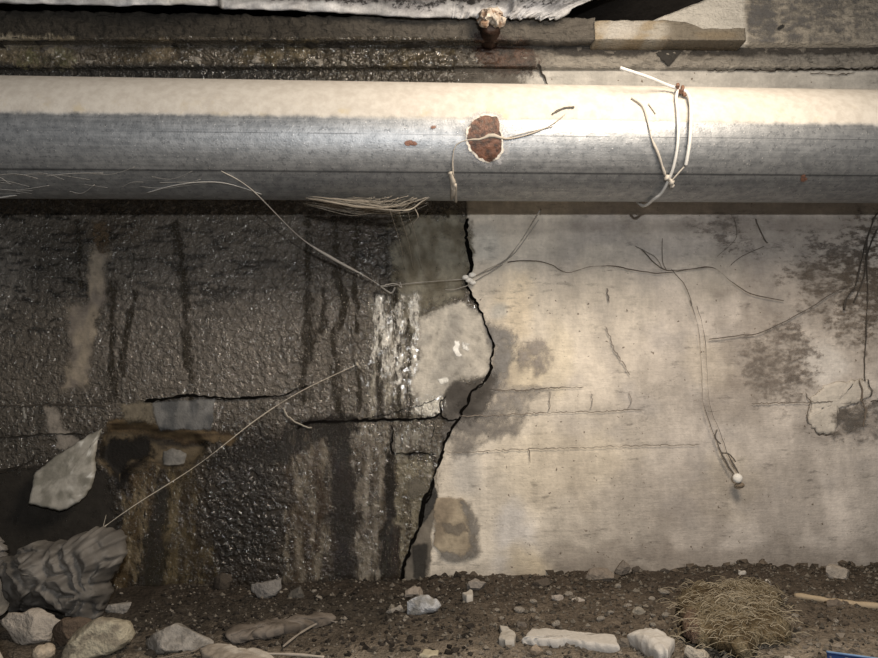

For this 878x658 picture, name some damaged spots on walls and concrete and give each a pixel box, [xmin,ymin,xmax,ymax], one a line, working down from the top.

rust [467,115,502,162]
damp [777,210,878,356]
crack [144,385,307,403]
damp [0,199,549,589]
crack [297,218,698,581]
damp [740,323,820,403]
spalling [28,418,236,511]